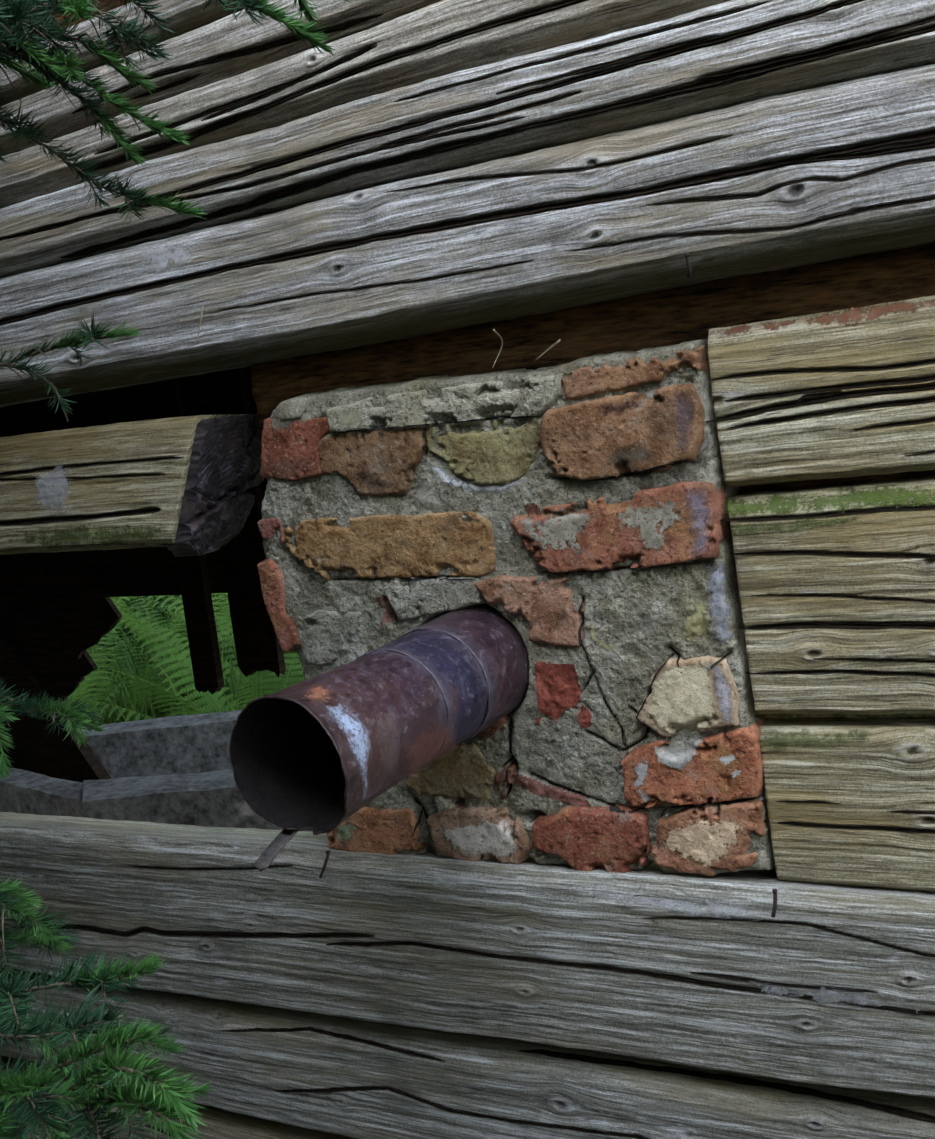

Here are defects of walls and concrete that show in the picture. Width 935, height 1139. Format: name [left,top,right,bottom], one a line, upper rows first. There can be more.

crack [0,0,935,258]
crack [0,130,935,325]
peeling [520,503,598,555]
peeling [617,494,683,550]
crack [540,551,935,759]
rust [307,686,331,700]
peeling [634,662,714,801]
peeling [718,754,743,778]
crack [13,925,935,1017]
crack [647,916,935,957]
crack [275,1086,650,1139]
crack [518,1049,935,1123]